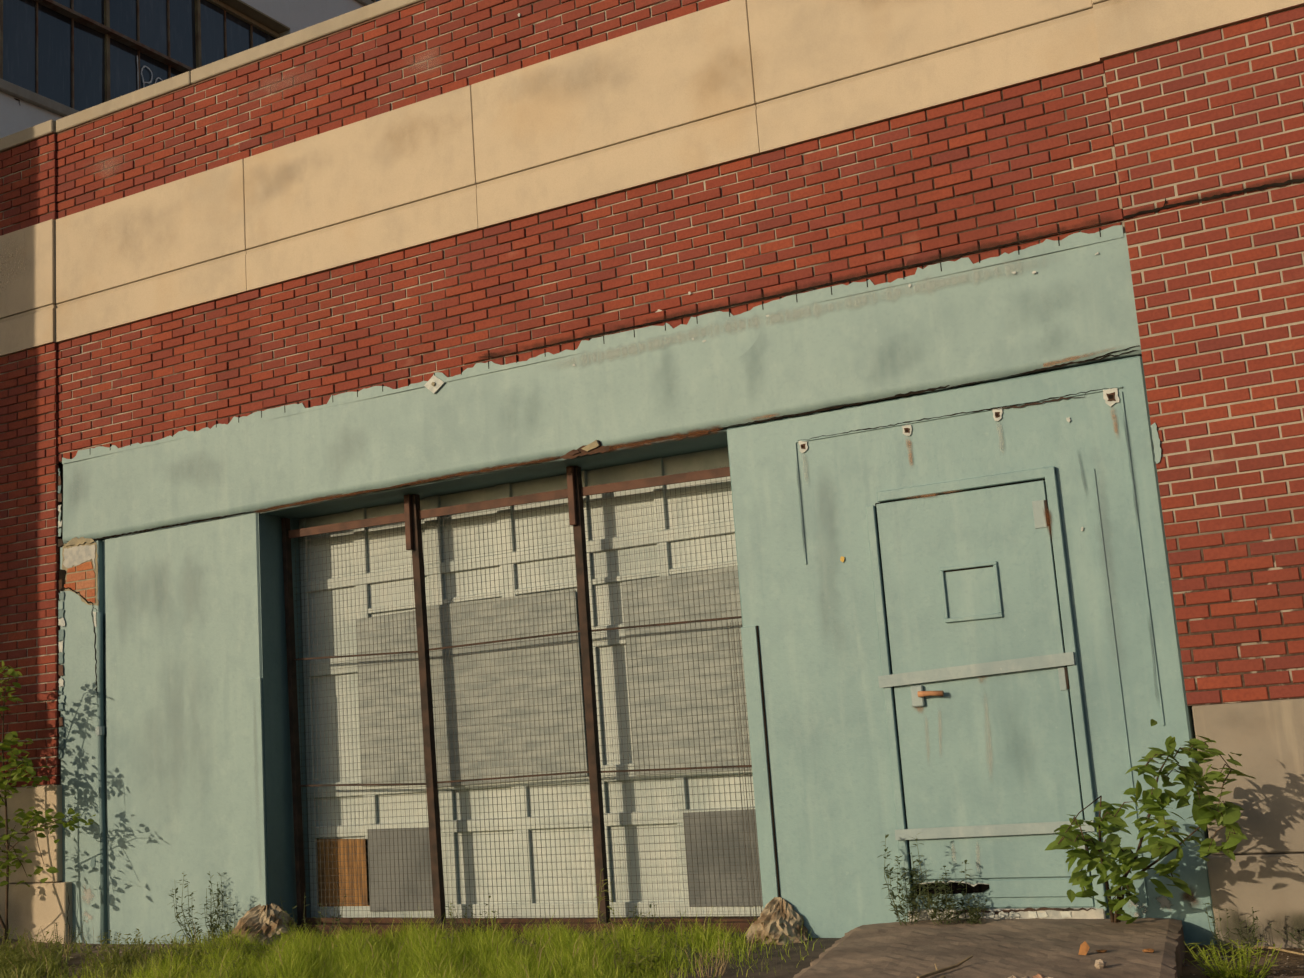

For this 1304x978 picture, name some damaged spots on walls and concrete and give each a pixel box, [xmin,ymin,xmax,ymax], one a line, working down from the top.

crack [486,178,1304,357]
spalling [559,440,610,459]
flaking render [56,469,99,759]